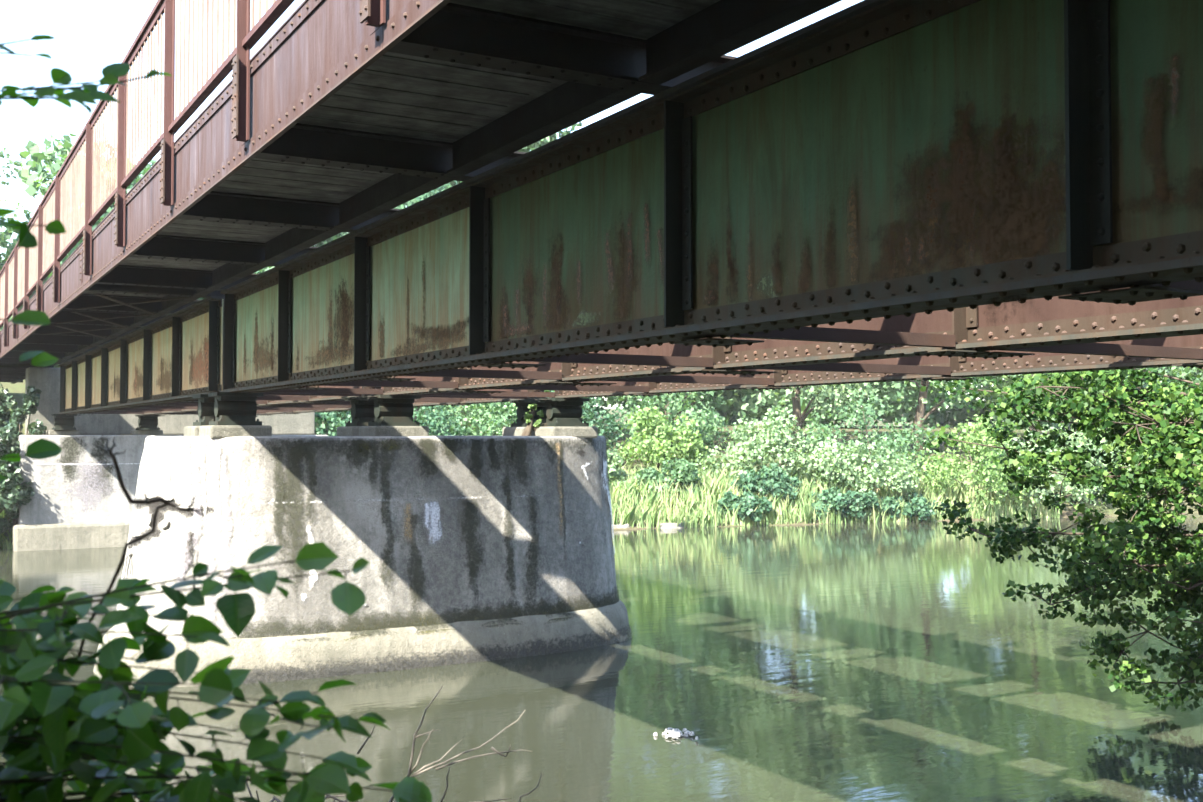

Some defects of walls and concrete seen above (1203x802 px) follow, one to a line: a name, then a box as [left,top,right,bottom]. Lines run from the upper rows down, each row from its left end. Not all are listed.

corrosion [296,284,354,370]
corrosion [379,262,469,358]
damp [420,439,457,477]
damp [273,441,318,600]
damp [347,440,442,608]
damp [461,500,483,595]
damp [469,438,539,596]